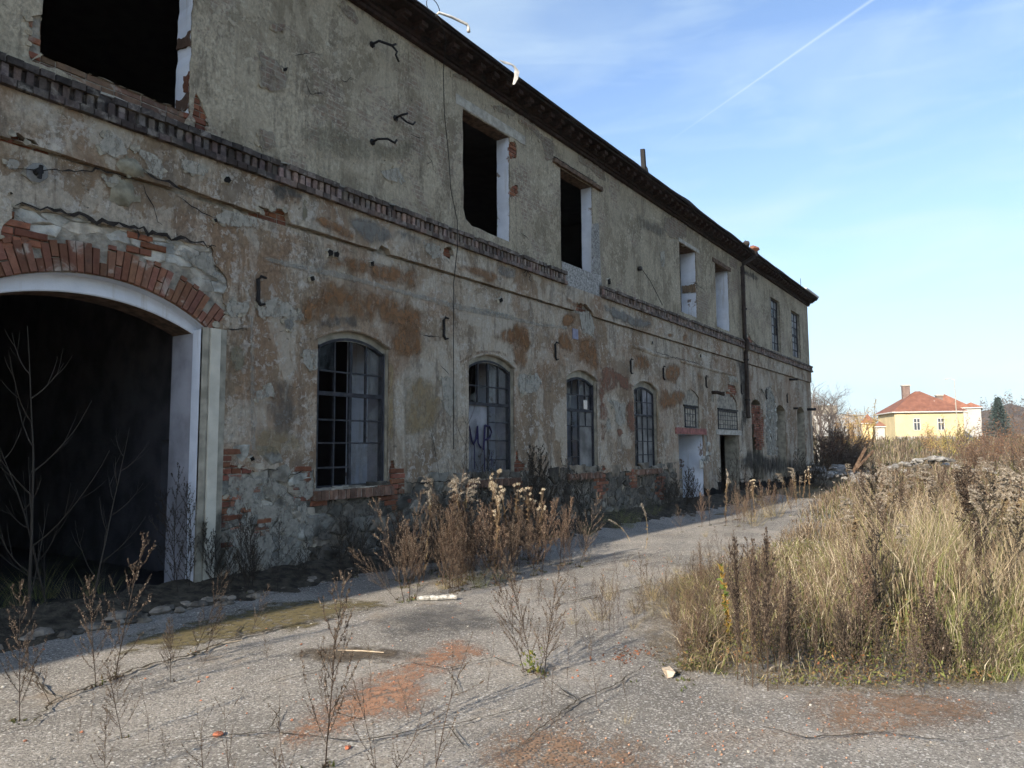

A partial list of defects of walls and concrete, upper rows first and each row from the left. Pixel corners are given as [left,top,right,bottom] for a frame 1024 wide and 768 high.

spalling [23,15,210,133]
crack [15,167,216,248]
spalling [0,192,305,332]
spalling [220,444,327,576]